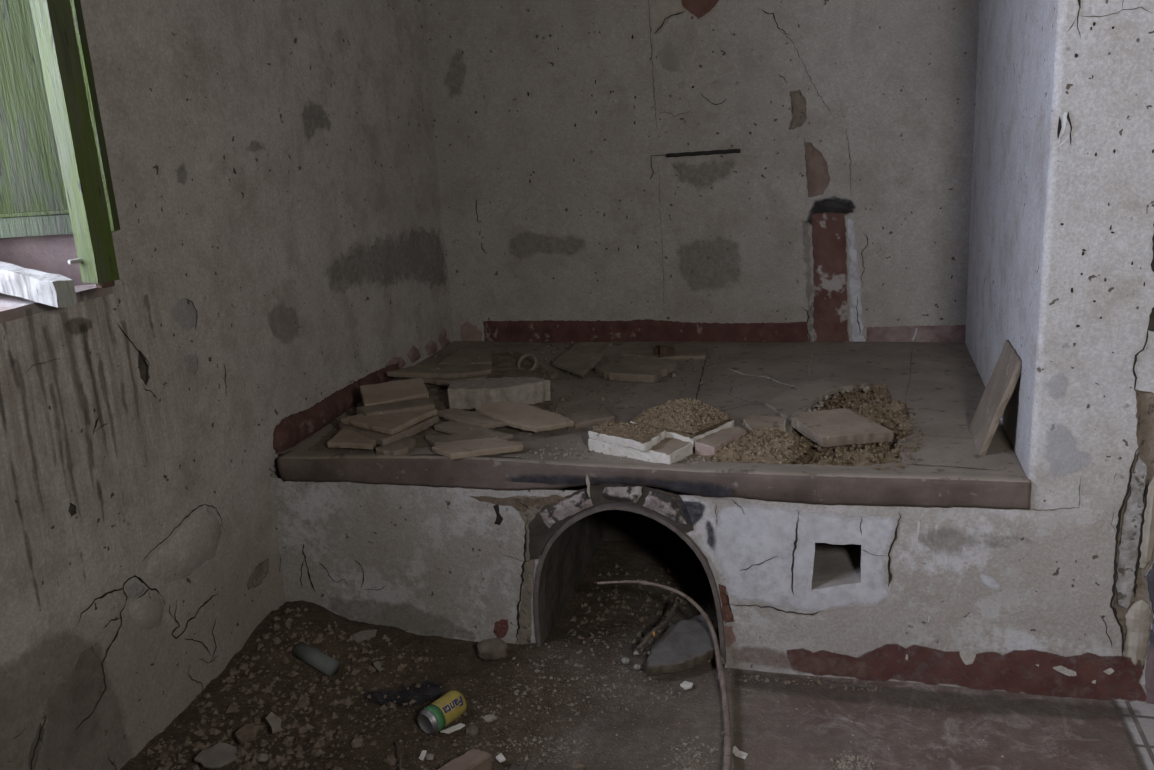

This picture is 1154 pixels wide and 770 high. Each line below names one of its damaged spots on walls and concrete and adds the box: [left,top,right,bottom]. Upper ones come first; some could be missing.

spalling [650,0,719,34]
crack [1067,0,1149,37]
crack [761,9,852,196]
spalling [788,89,830,197]
flaking render [847,219,865,342]
spalling [1092,307,1154,684]
crack [729,512,820,615]
crack [860,512,901,587]
crack [75,504,225,730]
spalling [960,650,976,665]
spalling [1053,666,1076,676]
crack [13,715,46,770]